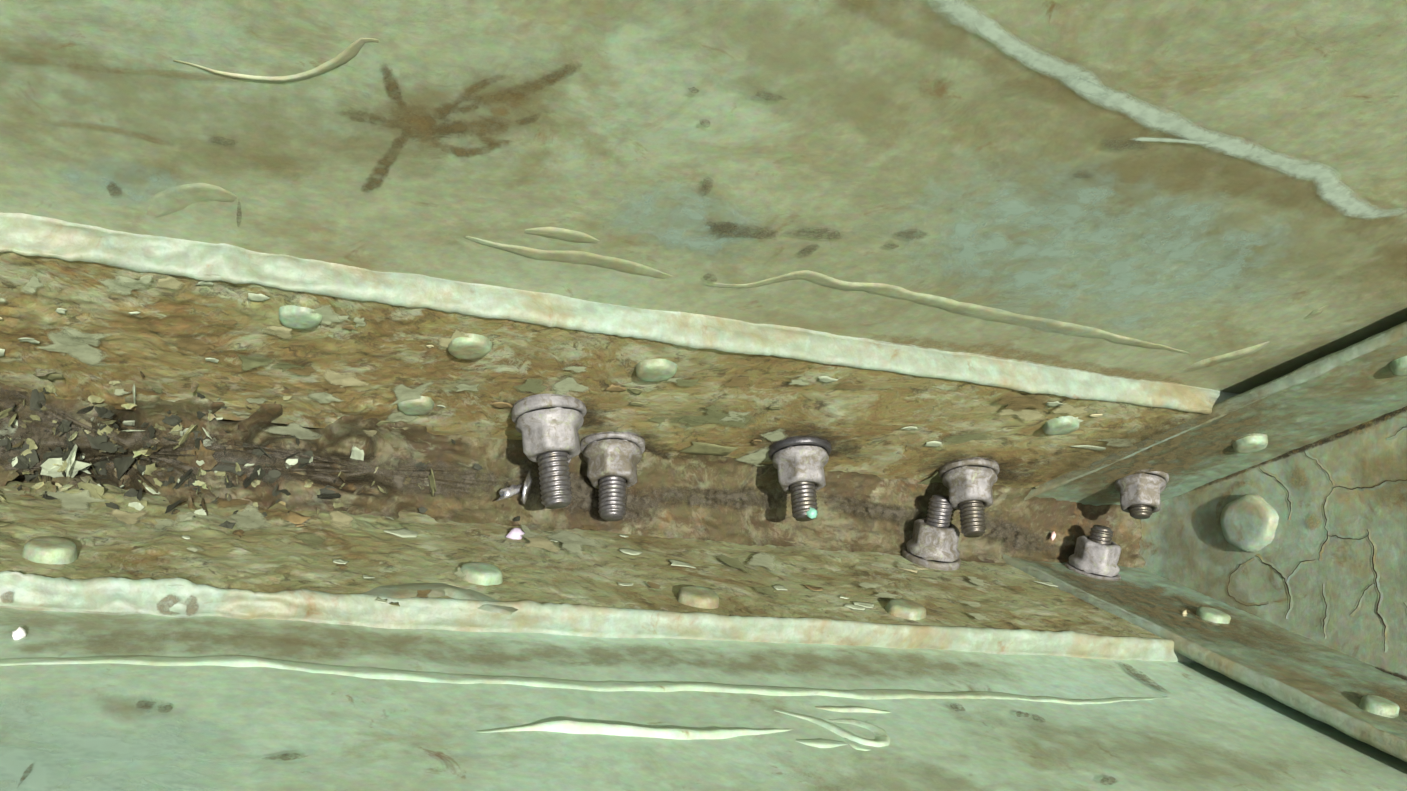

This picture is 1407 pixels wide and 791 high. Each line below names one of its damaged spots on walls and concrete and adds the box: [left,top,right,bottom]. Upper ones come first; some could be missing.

rust [353,65,574,190]
peeling [0,308,105,365]
peeling [262,325,292,339]
peeling [426,329,470,348]
peeling [33,371,65,382]
peeling [265,422,321,440]
peeling [237,354,369,403]
peeling [363,382,433,436]
peeling [456,384,479,392]
crack [1227,450,1407,652]